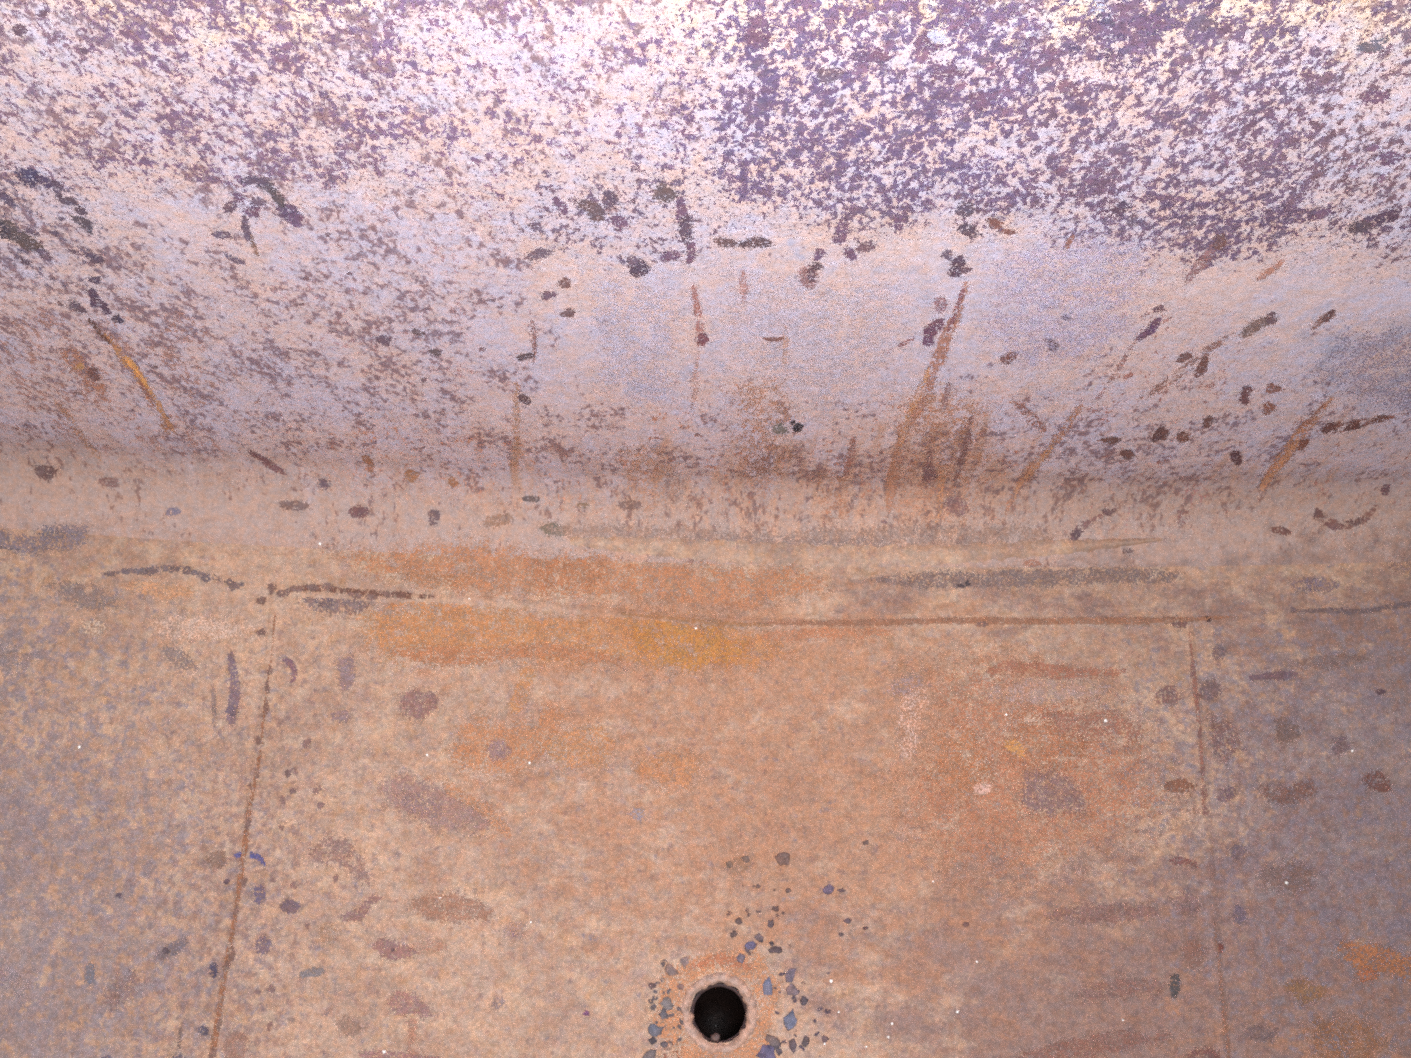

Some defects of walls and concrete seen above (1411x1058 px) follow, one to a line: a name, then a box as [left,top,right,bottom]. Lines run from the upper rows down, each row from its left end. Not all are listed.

rust [88,318,176,435]
rust [509,381,540,503]
rust [515,320,537,361]
rust [541,277,575,318]
rust [690,283,709,414]
rust [726,326,802,510]
rust [875,250,998,527]
rust [1262,383,1282,416]
rust [1258,393,1409,492]
rust [348,504,370,519]
rust [290,508,1235,899]
rust [643,856,831,1058]